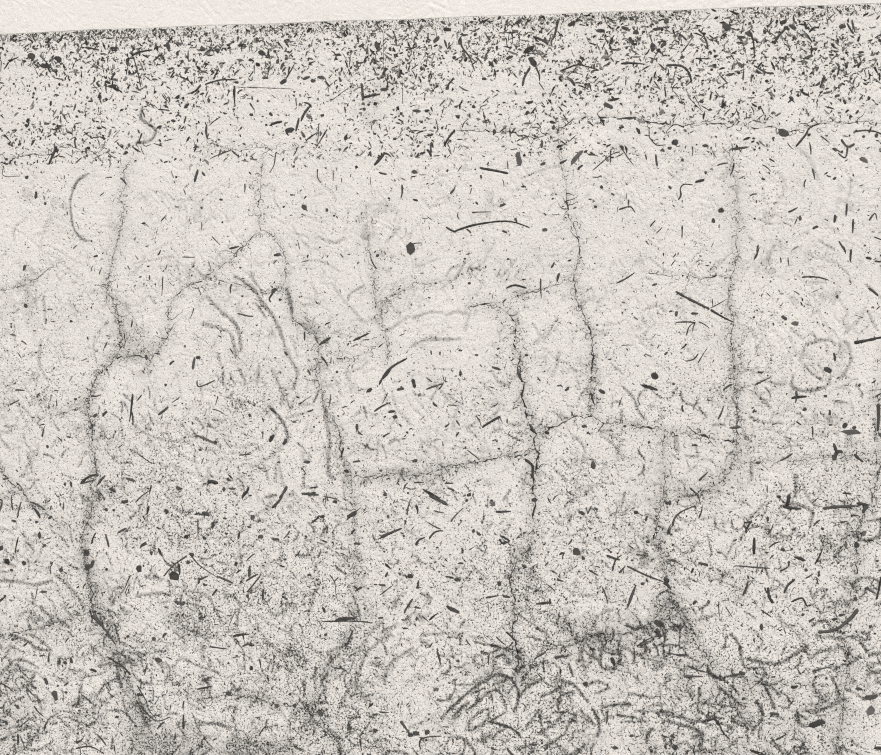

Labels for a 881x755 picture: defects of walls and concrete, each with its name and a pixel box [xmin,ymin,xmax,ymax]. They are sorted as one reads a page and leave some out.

crack [631,109,880,137]
crack [0,109,779,755]
crack [863,359,881,439]
crack [746,450,881,754]